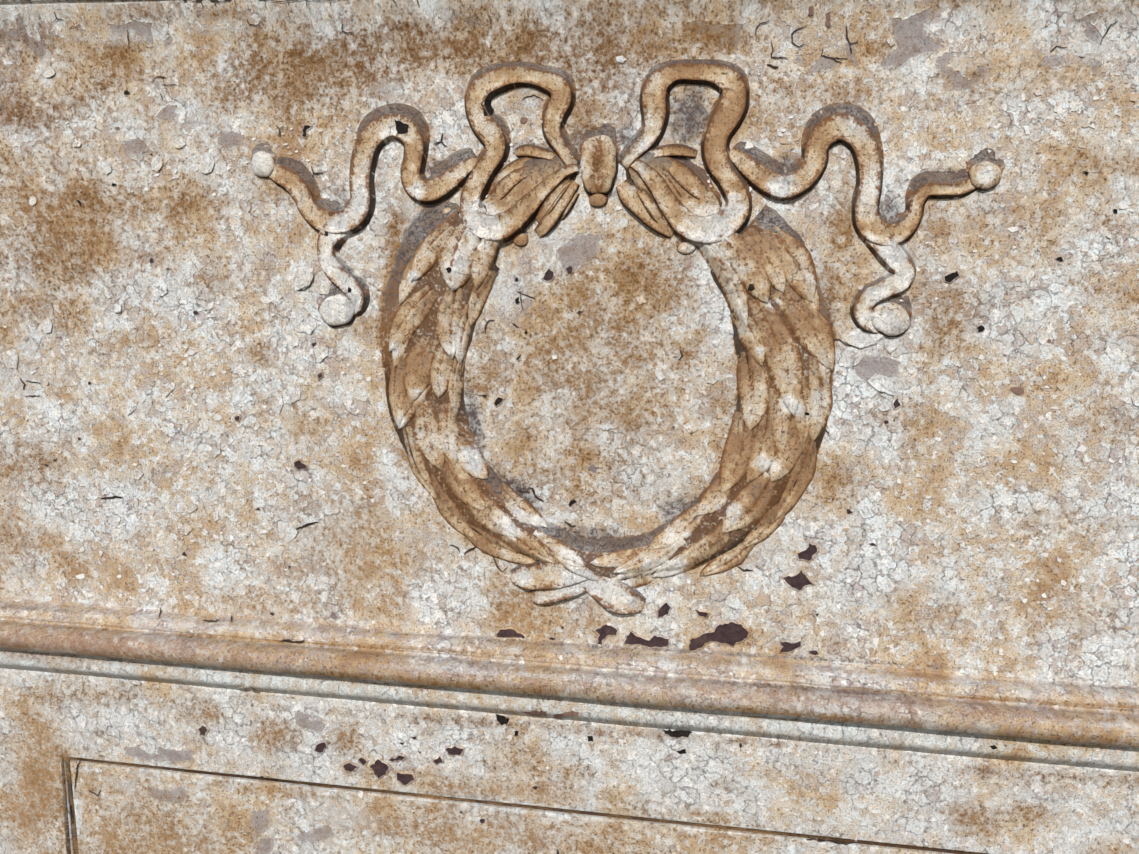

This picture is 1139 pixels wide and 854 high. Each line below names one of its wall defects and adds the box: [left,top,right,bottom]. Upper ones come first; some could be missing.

crack [755,20,858,68]
crack [1050,20,1118,58]
peeling [780,541,819,592]
peeling [656,600,673,619]
peeling [494,626,528,641]
peeling [593,622,672,649]
peeling [687,607,750,652]
peeling [778,638,818,655]
water stain [184,771,333,788]
peeling [342,737,465,786]
water stain [61,753,76,854]